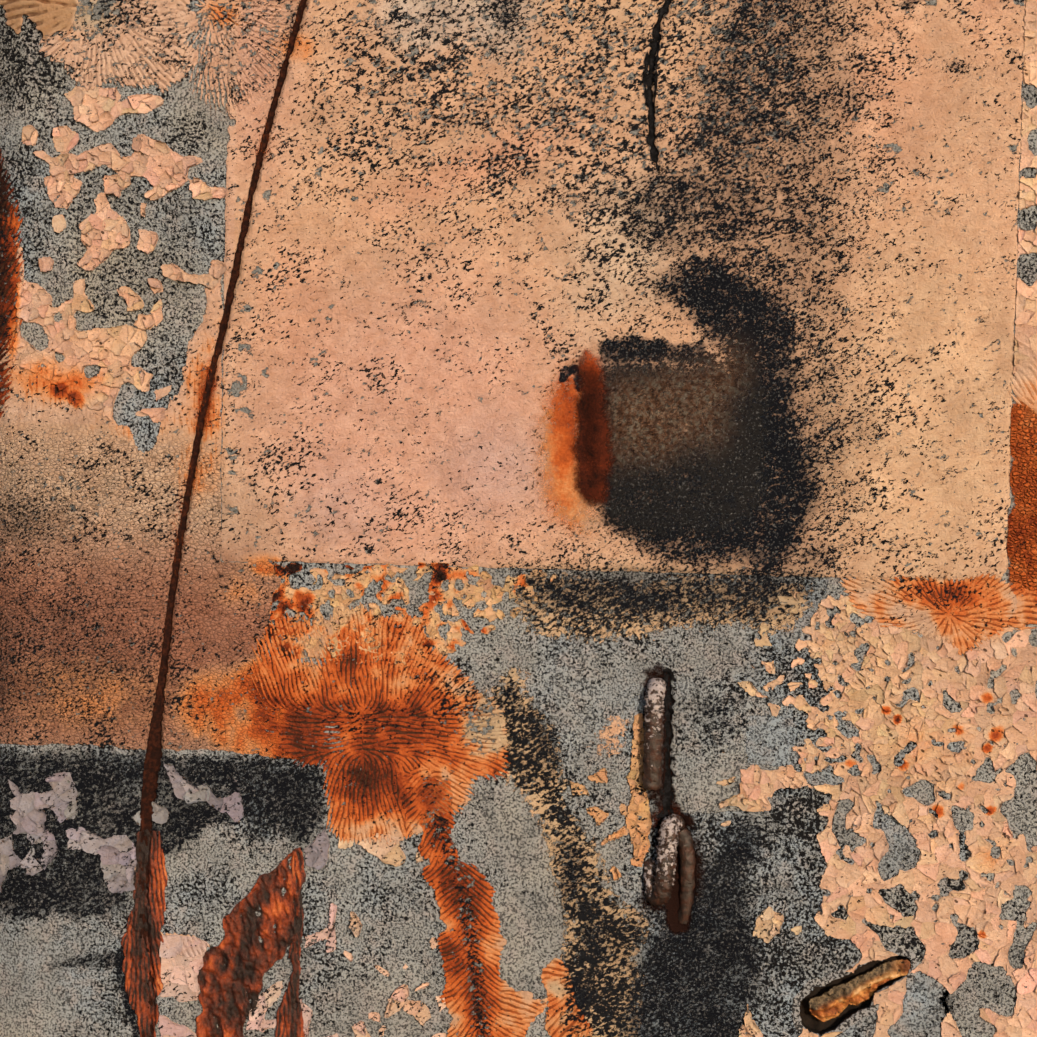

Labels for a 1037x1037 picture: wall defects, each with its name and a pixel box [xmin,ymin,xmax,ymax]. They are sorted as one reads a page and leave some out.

crack [642,0,672,175]
peeling [13,86,227,423]
damp [503,0,942,642]
peeling [0,772,137,893]
corrosion [196,847,306,1037]
peeling [267,563,539,665]
corrosion [249,602,593,1037]
damp [548,807,792,1037]
damp [682,642,763,770]
peeling [601,578,1037,1037]
corrosion [792,947,919,1037]
corrosion [840,402,1037,657]